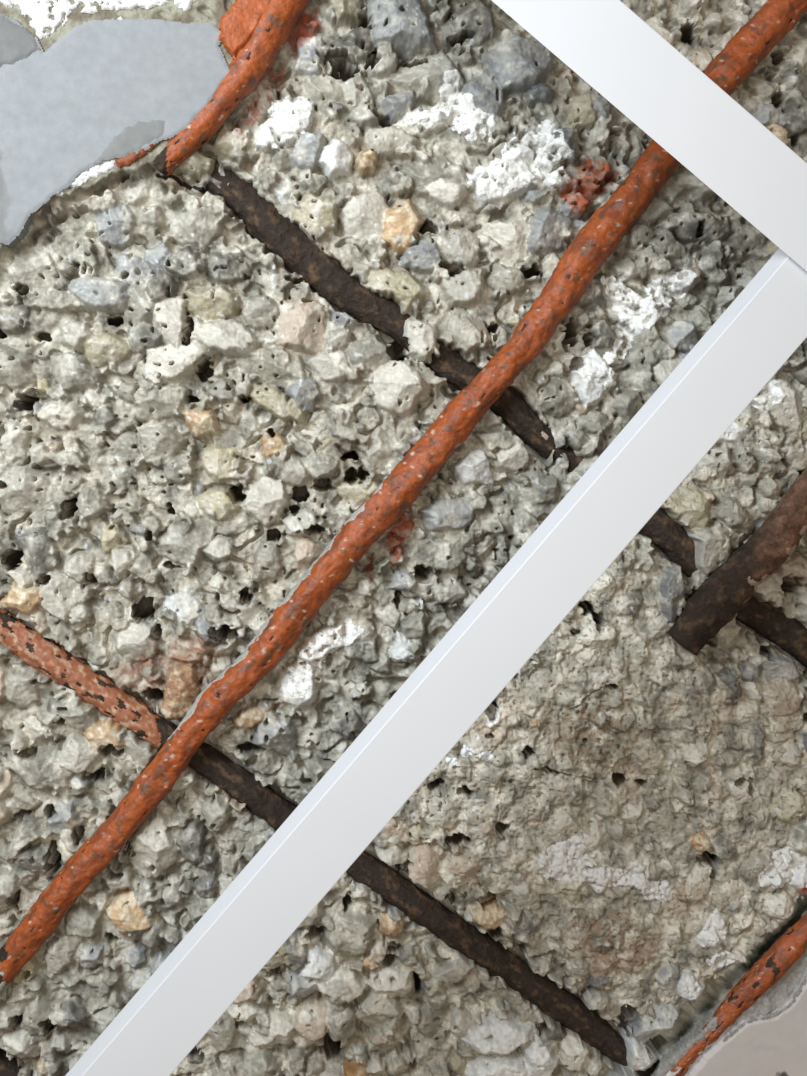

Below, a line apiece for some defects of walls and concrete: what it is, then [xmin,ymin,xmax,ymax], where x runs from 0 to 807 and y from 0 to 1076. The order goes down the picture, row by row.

corrosion [289,13,320,52]
spalling [620,0,807,163]
corrosion [561,159,619,216]
spalling [188,164,779,831]
corrosion [386,514,414,565]
spalling [0,139,681,1076]
corrosion [123,635,215,712]